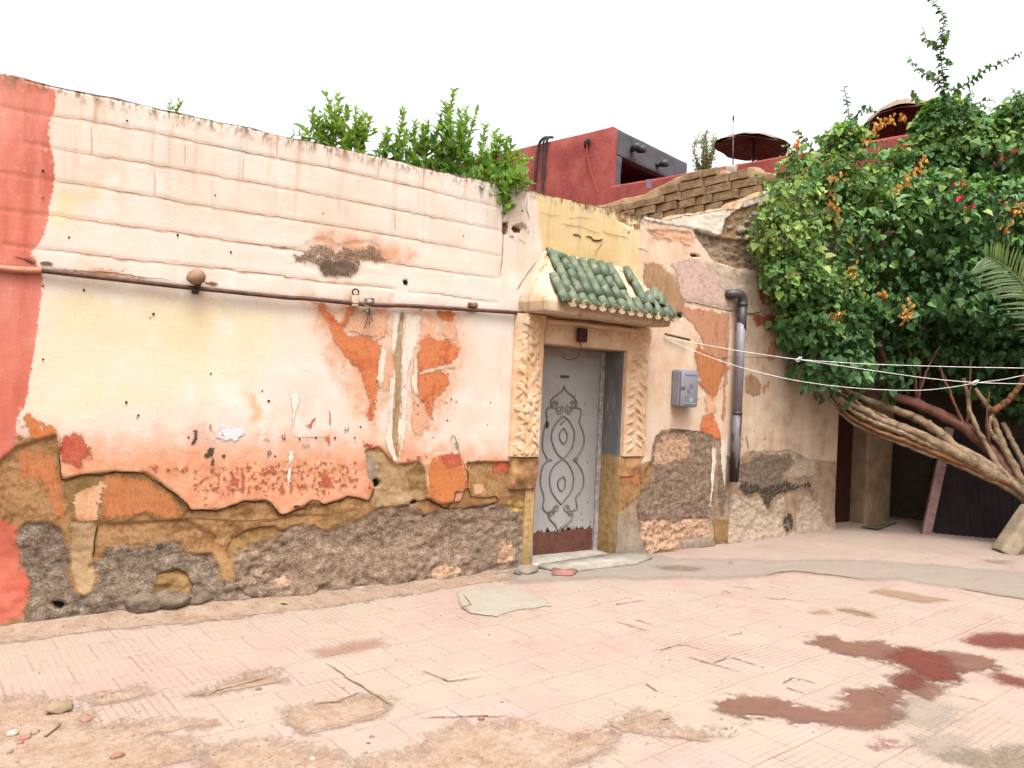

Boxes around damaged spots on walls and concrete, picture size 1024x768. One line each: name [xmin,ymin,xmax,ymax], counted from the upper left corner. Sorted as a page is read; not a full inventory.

spalling [0,412,535,623]
spalling [618,428,716,554]
spalling [740,430,816,479]
spalling [727,491,832,544]